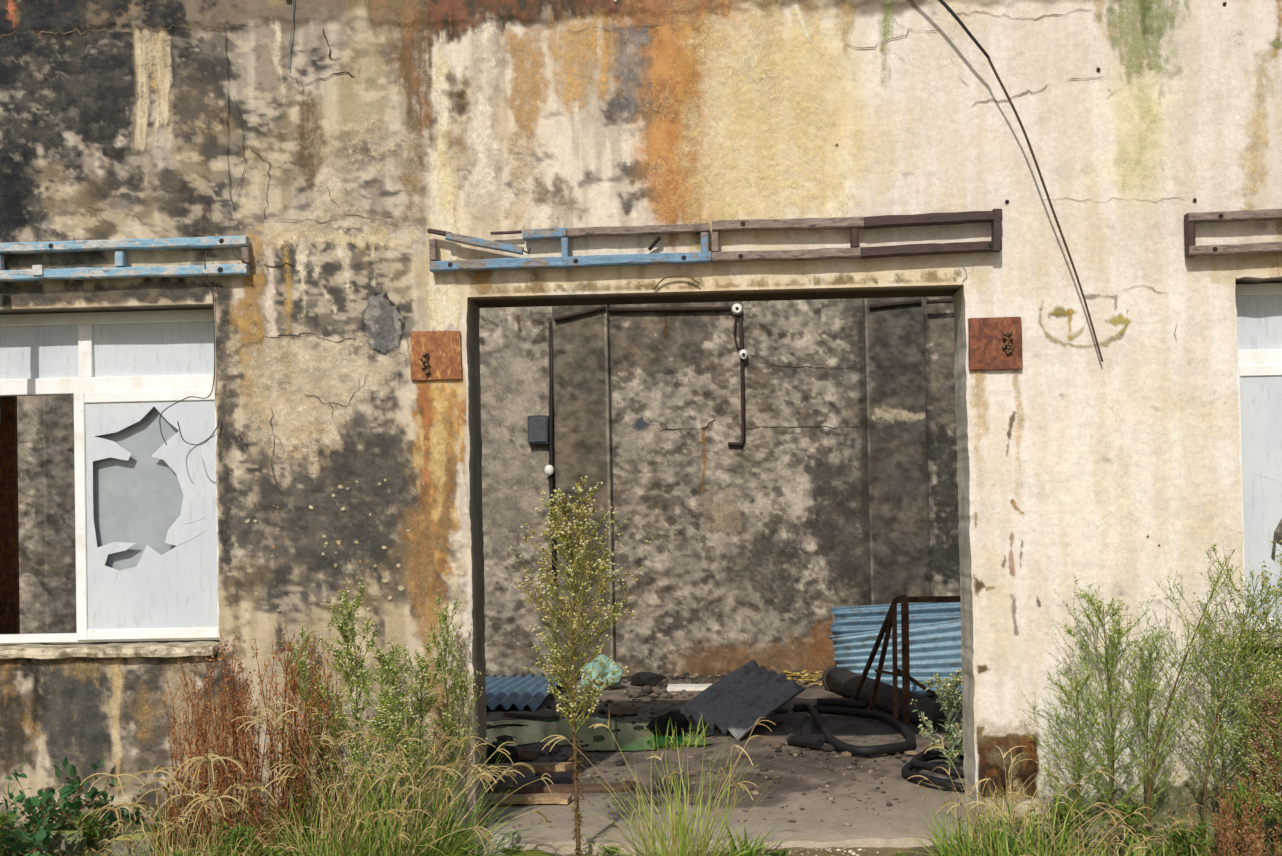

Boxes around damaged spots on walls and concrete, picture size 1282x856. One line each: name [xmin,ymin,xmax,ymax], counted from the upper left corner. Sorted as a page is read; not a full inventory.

water stain [0,0,231,306]
crack [0,19,427,270]
rust [349,0,743,244]
water stain [392,4,877,331]
crack [961,76,1120,106]
rust [1244,0,1282,210]
spalling [362,292,405,354]
water stain [219,417,449,627]
rust [401,375,466,765]
water stain [0,637,256,823]
rust [977,730,1039,829]